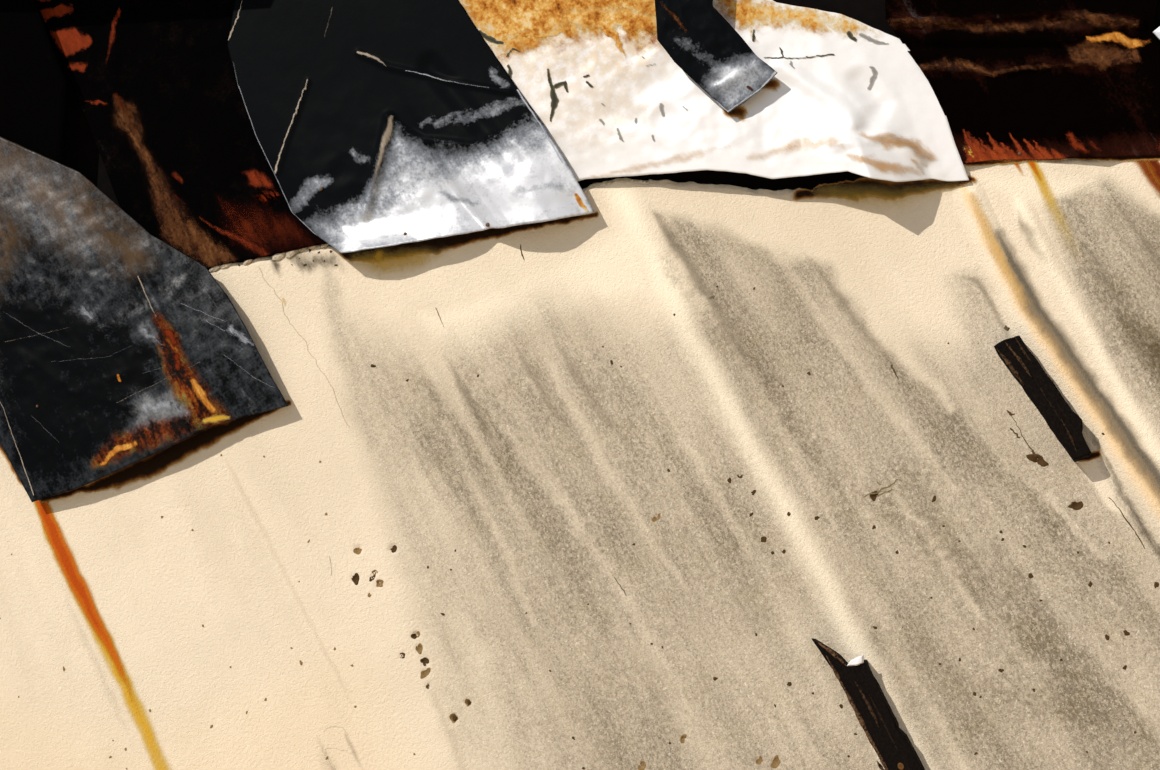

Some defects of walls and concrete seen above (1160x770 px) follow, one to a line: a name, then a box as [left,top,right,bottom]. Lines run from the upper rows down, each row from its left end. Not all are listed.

peeling [478,30,520,78]
corrosion [458,0,686,55]
peeling [847,31,888,44]
peeling [547,69,568,122]
corrosion [793,129,1160,207]
spalling [209,259,253,273]
spalling [272,244,338,266]
corrosion [973,198,1160,497]
corrosion [34,314,291,770]